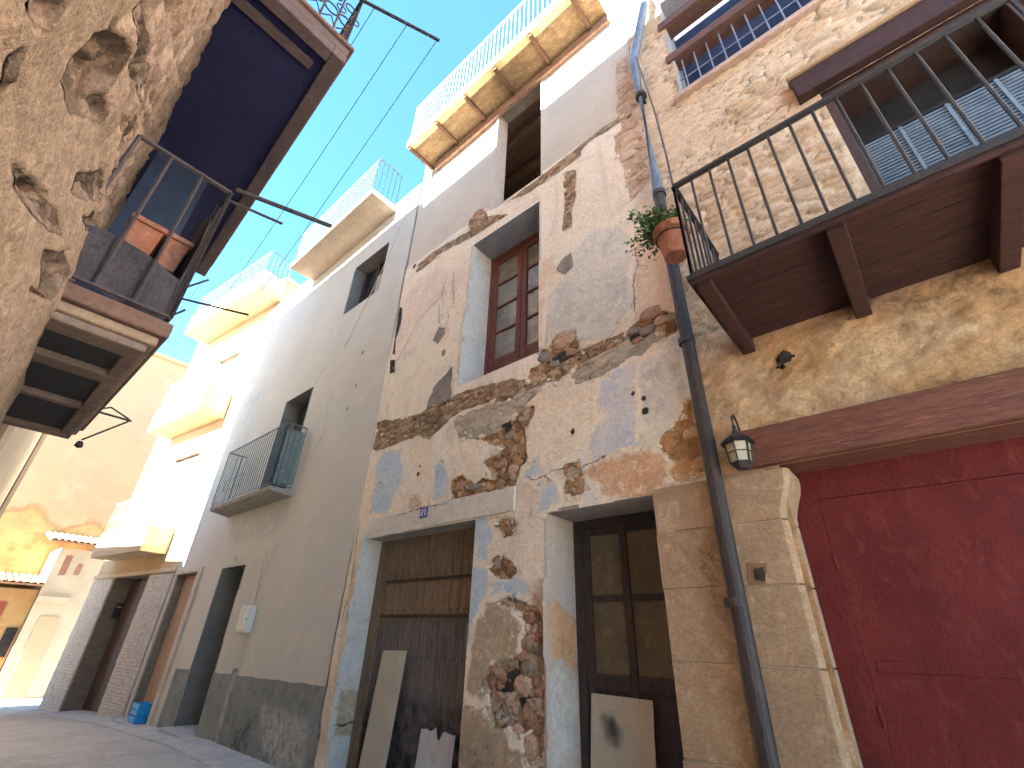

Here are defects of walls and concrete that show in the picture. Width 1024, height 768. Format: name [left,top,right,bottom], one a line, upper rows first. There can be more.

flaking render [614,55,649,201]
spalling [468,207,495,230]
spalling [546,170,577,231]
spalling [447,228,678,501]
crack [527,453,609,482]
spalling [659,388,705,486]
spalling [494,515,519,539]
spalling [462,552,545,768]